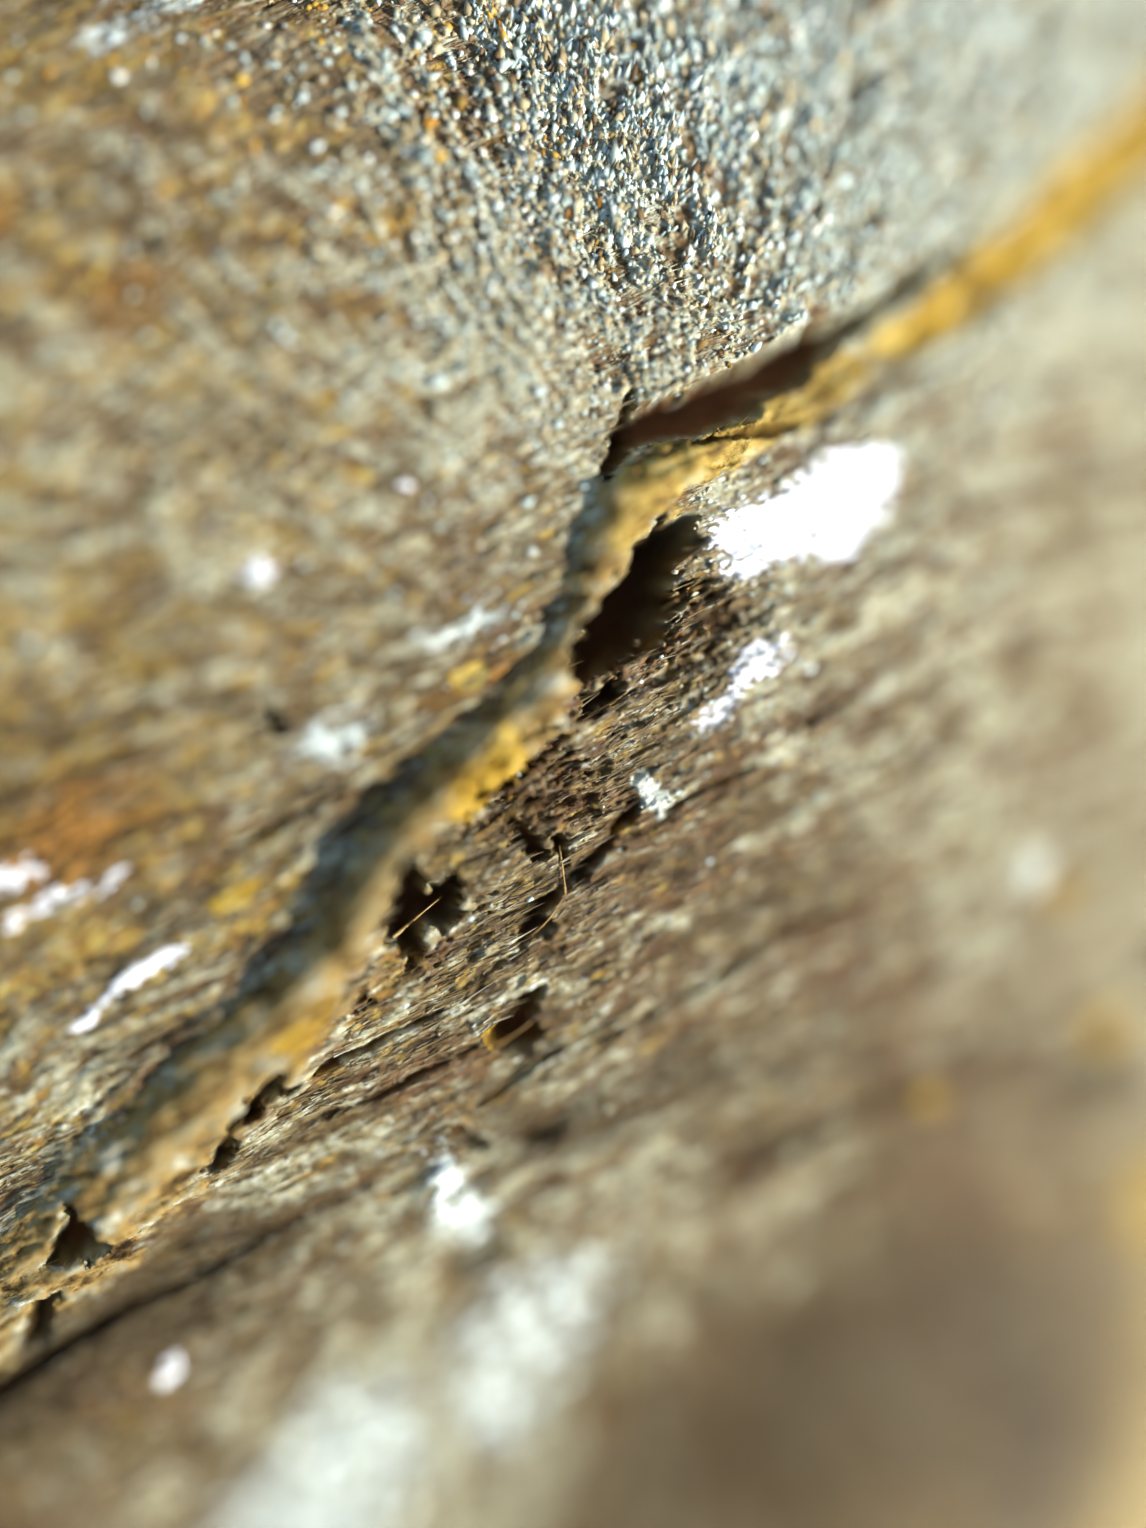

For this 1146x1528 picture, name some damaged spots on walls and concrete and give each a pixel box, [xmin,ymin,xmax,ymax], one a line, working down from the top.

crack [598,247,956,476]
crack [567,522,679,714]
crack [221,797,328,854]
crack [384,858,452,945]
crack [503,767,747,937]
crack [214,1016,423,1159]
crack [377,991,544,1099]
crack [56,1209,99,1250]
crack [0,1296,106,1388]